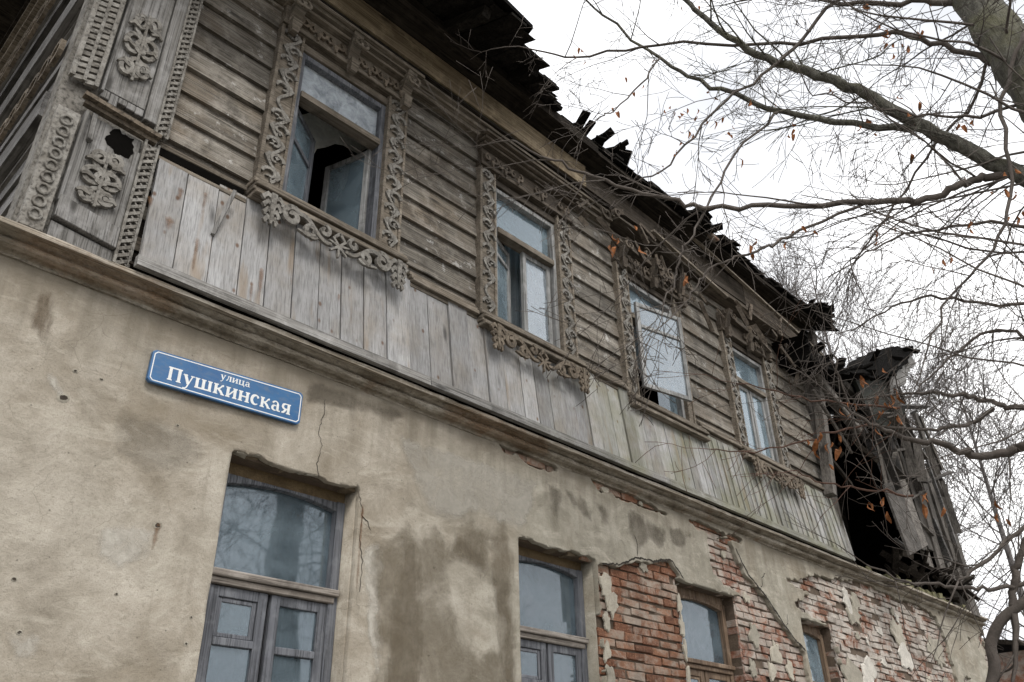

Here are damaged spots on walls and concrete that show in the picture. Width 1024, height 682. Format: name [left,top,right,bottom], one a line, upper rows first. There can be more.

crack [358,491,371,592]
damp [364,531,511,682]
flaking render [592,481,662,514]
flaking render [579,556,691,682]
flaking render [689,520,806,682]
flaking render [787,577,970,682]